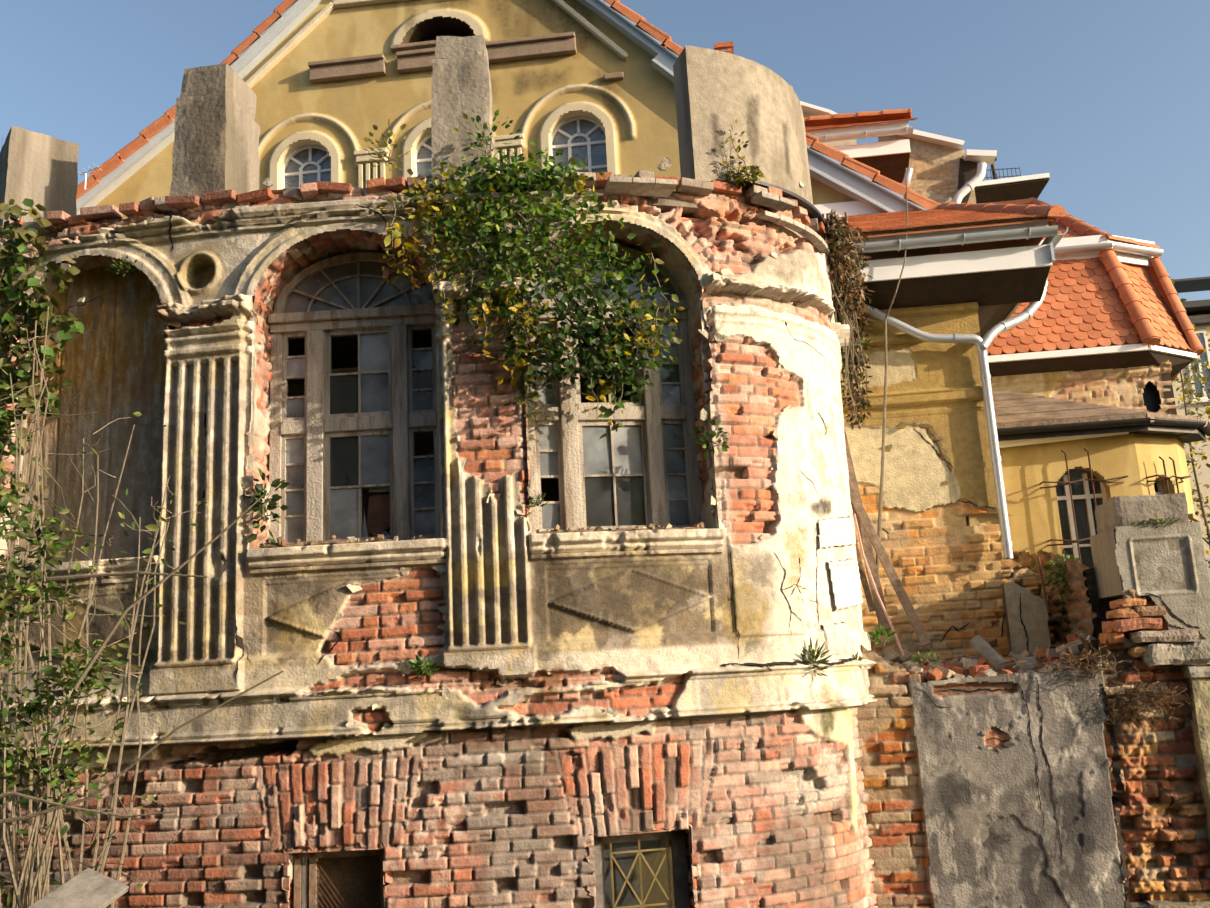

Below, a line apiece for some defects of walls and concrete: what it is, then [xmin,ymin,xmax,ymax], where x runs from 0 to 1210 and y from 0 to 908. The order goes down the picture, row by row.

flaking render [447,286,542,518]
flaking render [582,184,844,546]
flaking render [345,704,394,733]
flaking render [302,564,693,718]
crack [721,538,855,671]
flaking render [843,417,1051,662]
crack [913,593,1063,865]
flaking render [980,726,1015,753]